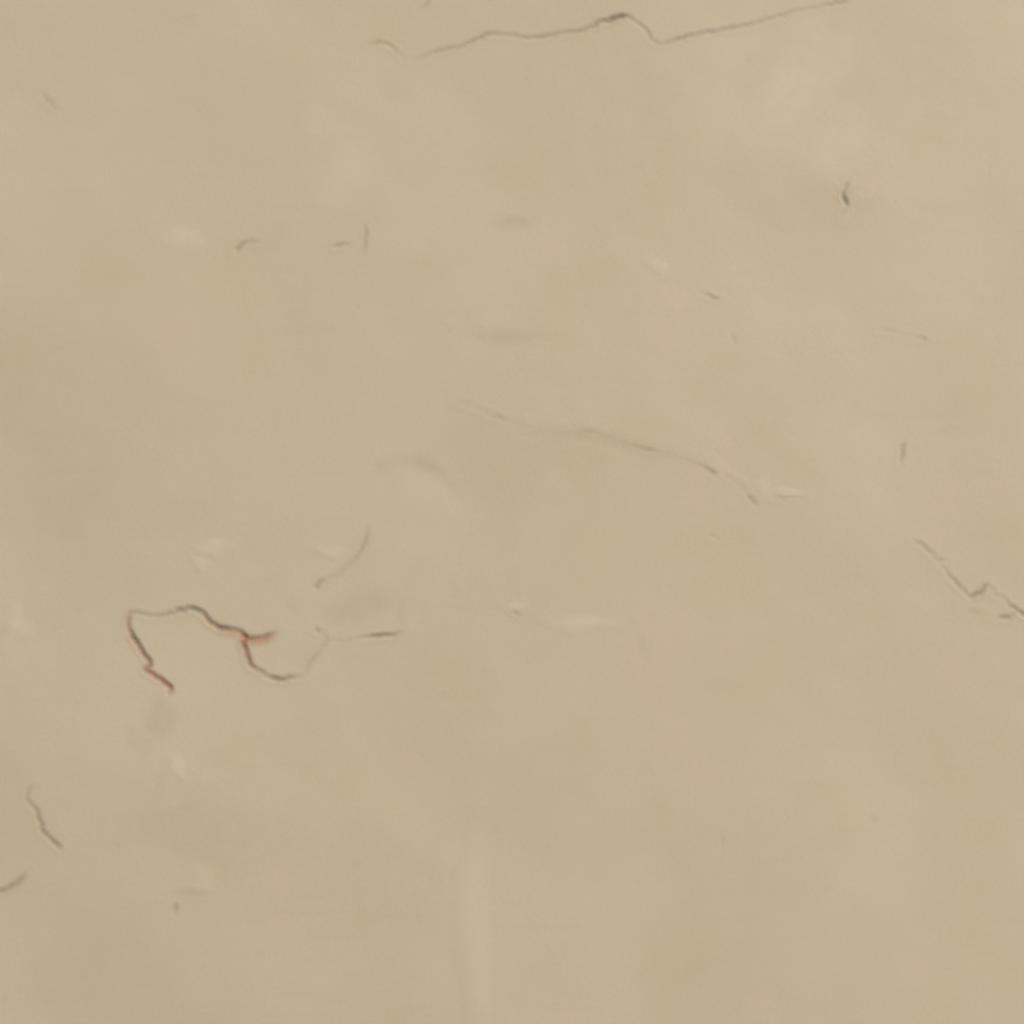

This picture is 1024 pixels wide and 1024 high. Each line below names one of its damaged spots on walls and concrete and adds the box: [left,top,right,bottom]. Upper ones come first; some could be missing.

crack [360,0,856,71]
crack [904,530,1024,629]
crack [119,600,414,707]
crack [0,777,72,901]